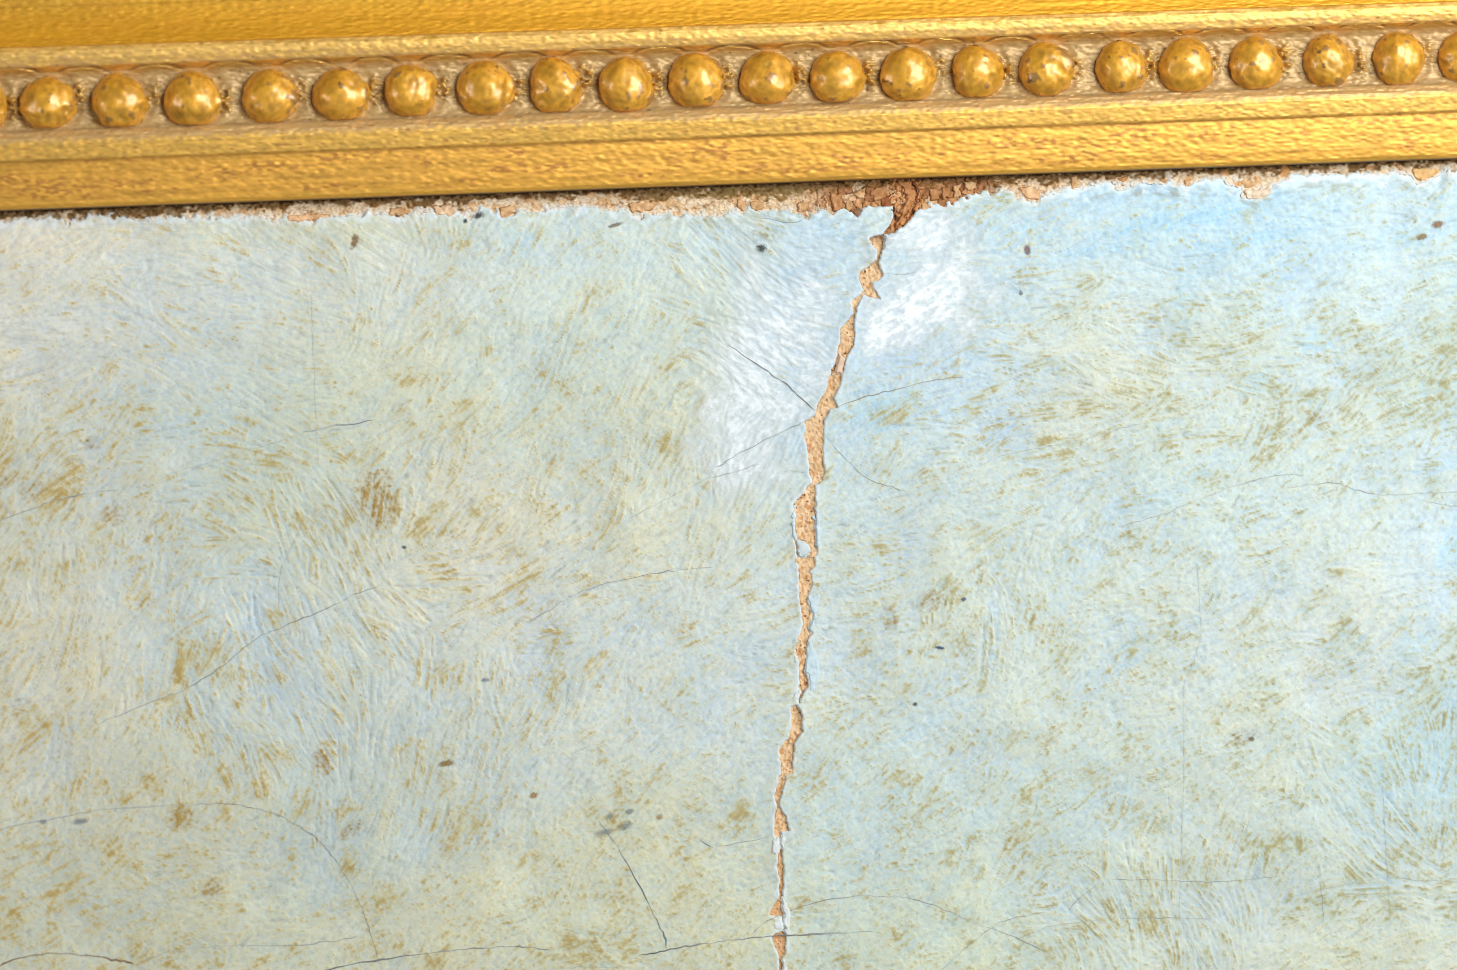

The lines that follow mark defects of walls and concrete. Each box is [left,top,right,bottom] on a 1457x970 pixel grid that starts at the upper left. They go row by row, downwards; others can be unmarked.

peeling [0,159,1457,228]
crack [1,297,371,520]
crack [97,514,378,725]
crack [527,567,711,623]
crack [568,179,1457,970]
crack [0,803,549,970]